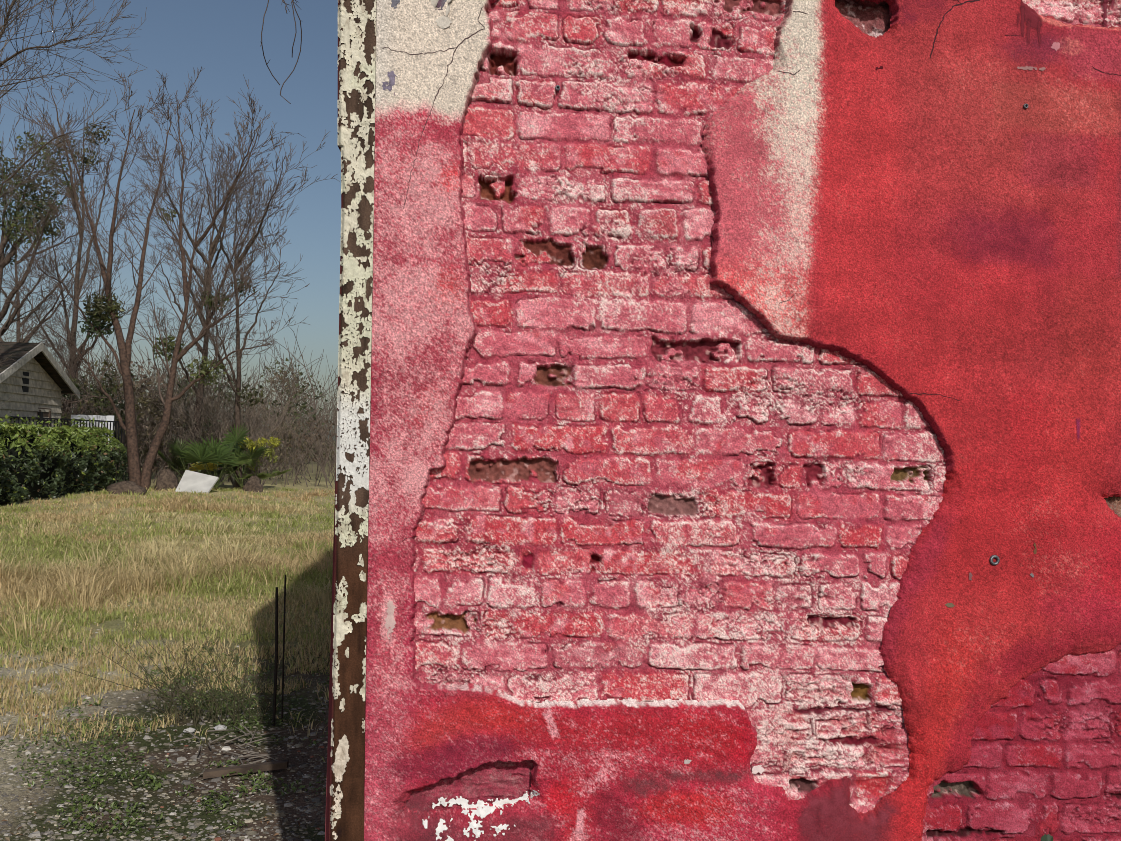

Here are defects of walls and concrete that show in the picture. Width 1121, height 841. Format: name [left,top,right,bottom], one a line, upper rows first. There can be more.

crack [930,0,980,58]
spalling [1022,0,1121,28]
peeling [330,0,398,840]
spalling [406,0,946,813]
spalling [1104,496,1121,518]
spalling [922,643,1121,841]